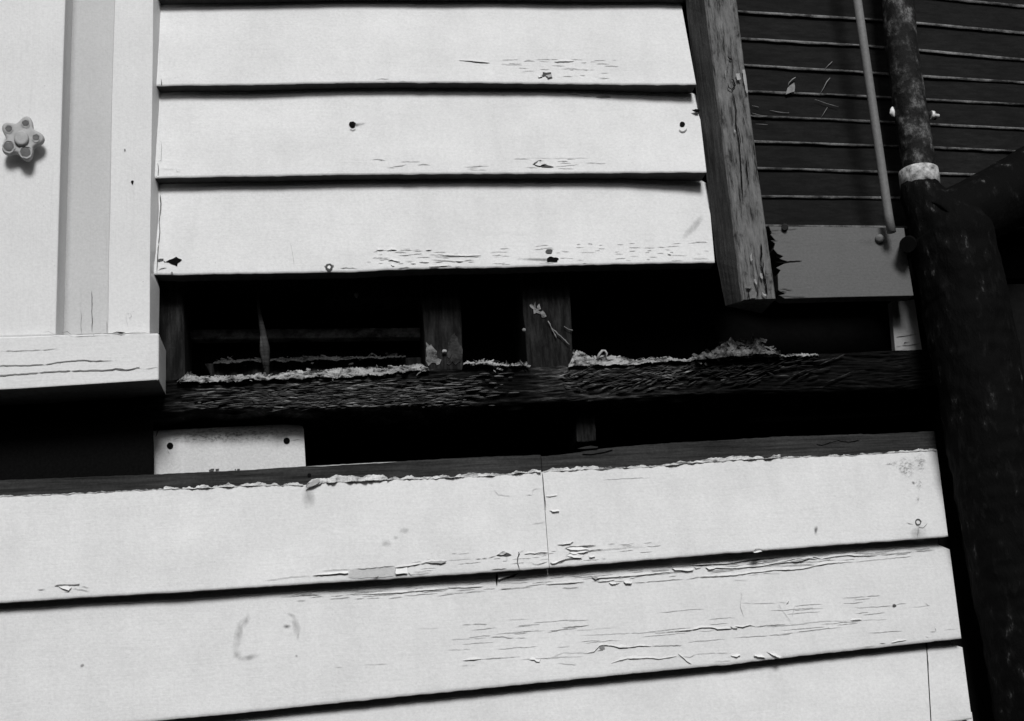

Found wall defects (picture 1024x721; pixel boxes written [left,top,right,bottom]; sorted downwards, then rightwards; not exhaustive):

crack [0,293,155,376]
peeling [0,434,937,497]
peeling [316,566,411,578]
peeling [490,551,520,580]
peeling [551,540,625,563]